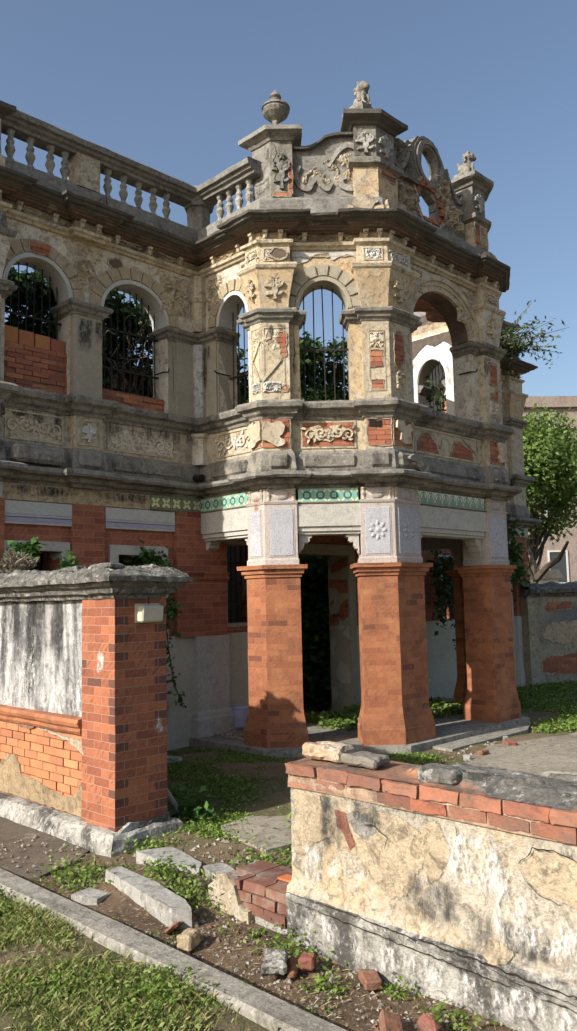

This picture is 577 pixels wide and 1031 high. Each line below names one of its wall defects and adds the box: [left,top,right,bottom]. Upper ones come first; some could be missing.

spalling [352,176,449,229]
flaking render [253,417,474,461]
leakage [1,601,62,703]
flaking render [541,600,577,676]
leakage [41,679,81,711]
leakage [305,797,339,878]
leakage [353,802,379,824]
flaking render [293,788,451,899]
crack [286,892,577,1014]
leakage [410,878,455,921]
leakage [449,835,577,1016]
crack [518,847,577,906]